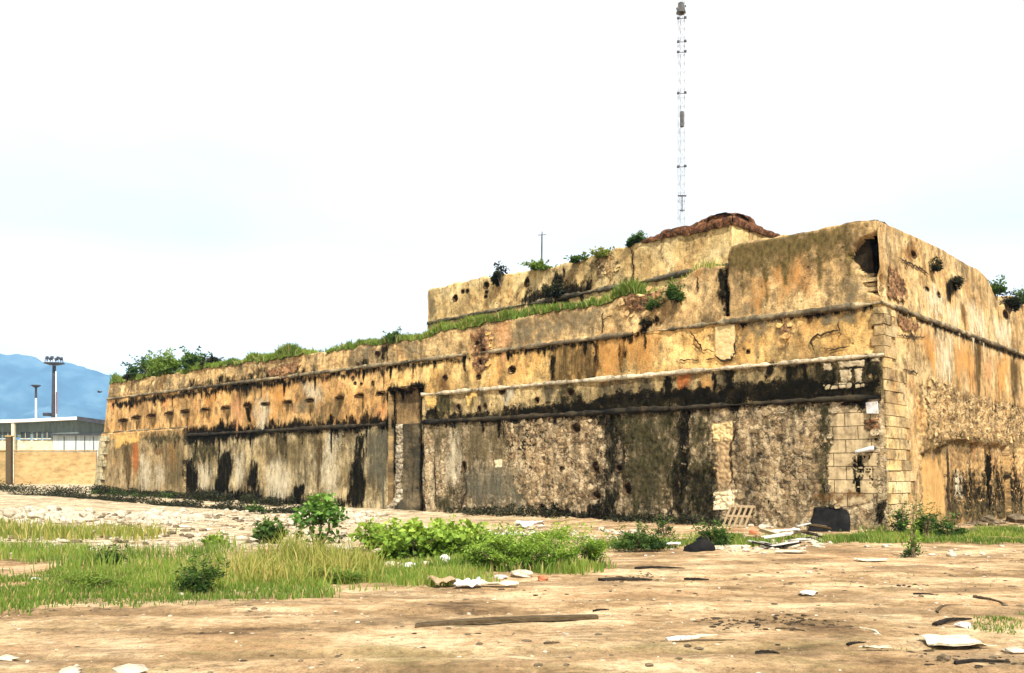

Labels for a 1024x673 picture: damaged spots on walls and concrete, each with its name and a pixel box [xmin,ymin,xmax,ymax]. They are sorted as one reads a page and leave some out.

spalling [470,326,496,374]
damp [112,233,886,525]
crack [679,332,736,362]
crack [809,321,848,353]
spalling [731,404,882,528]
spalling [921,375,1024,518]
damp [929,434,1024,524]